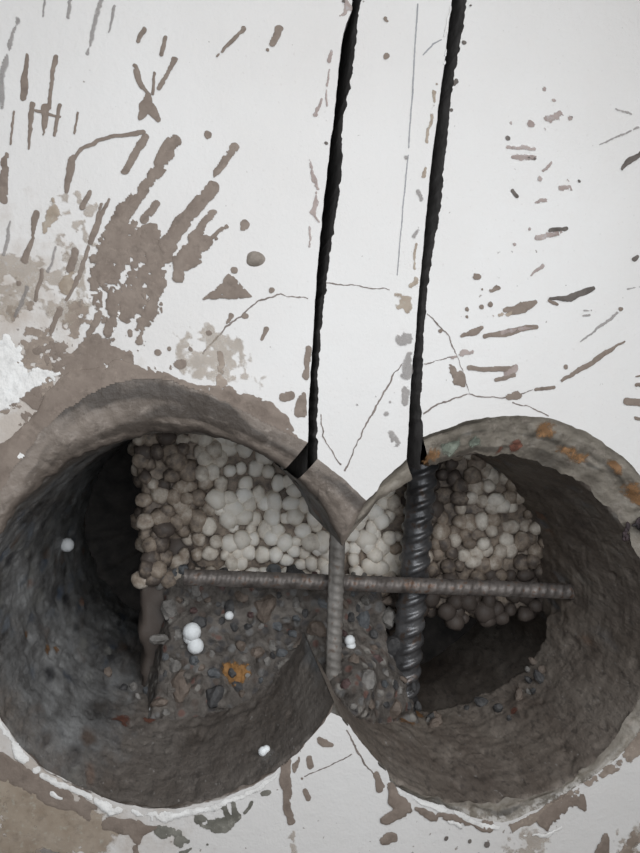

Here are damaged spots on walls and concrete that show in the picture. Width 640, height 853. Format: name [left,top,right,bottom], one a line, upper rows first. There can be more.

water stain [64,130,149,193]
water stain [120,134,182,224]
water stain [158,142,239,253]
water stain [49,198,110,338]
crack [326,282,389,290]
peeling [0,334,61,411]
crack [321,364,402,471]
spalling [145,464,575,724]
flaking render [0,721,278,823]
peeling [317,737,334,747]
flaking render [397,787,500,830]
water stain [507,731,640,853]